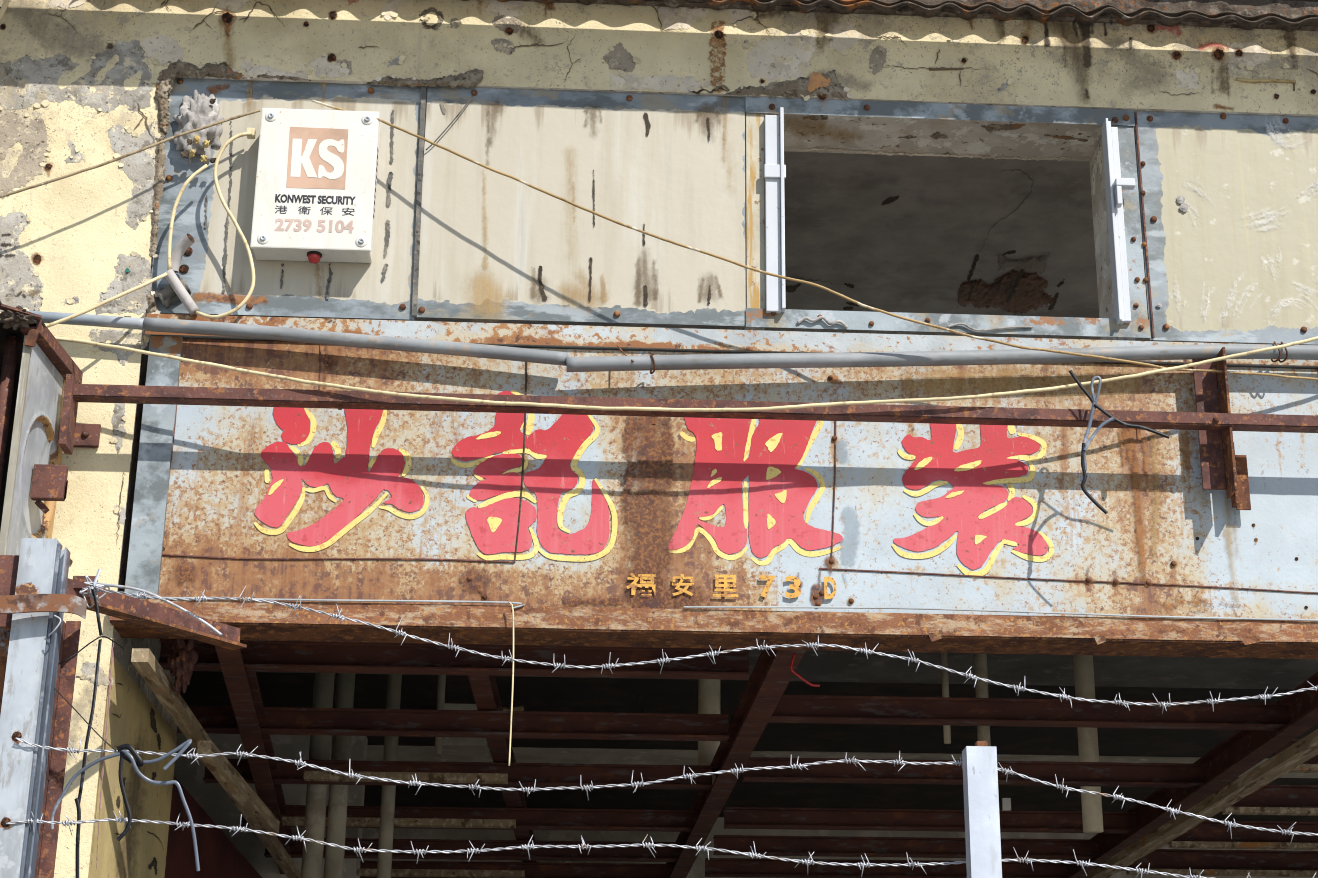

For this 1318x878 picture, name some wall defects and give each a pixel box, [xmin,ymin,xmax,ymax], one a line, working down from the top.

spalling [366,55,484,114]
peeling [656,6,709,29]
rust [697,21,727,128]
peeling [603,19,859,121]
peeling [868,45,889,75]
peeling [0,40,352,365]
peeling [381,110,394,282]
rust [981,373,1128,392]
rust [563,416,704,609]
rust [1118,428,1151,586]
rust [798,556,835,605]
rust [1156,595,1241,612]